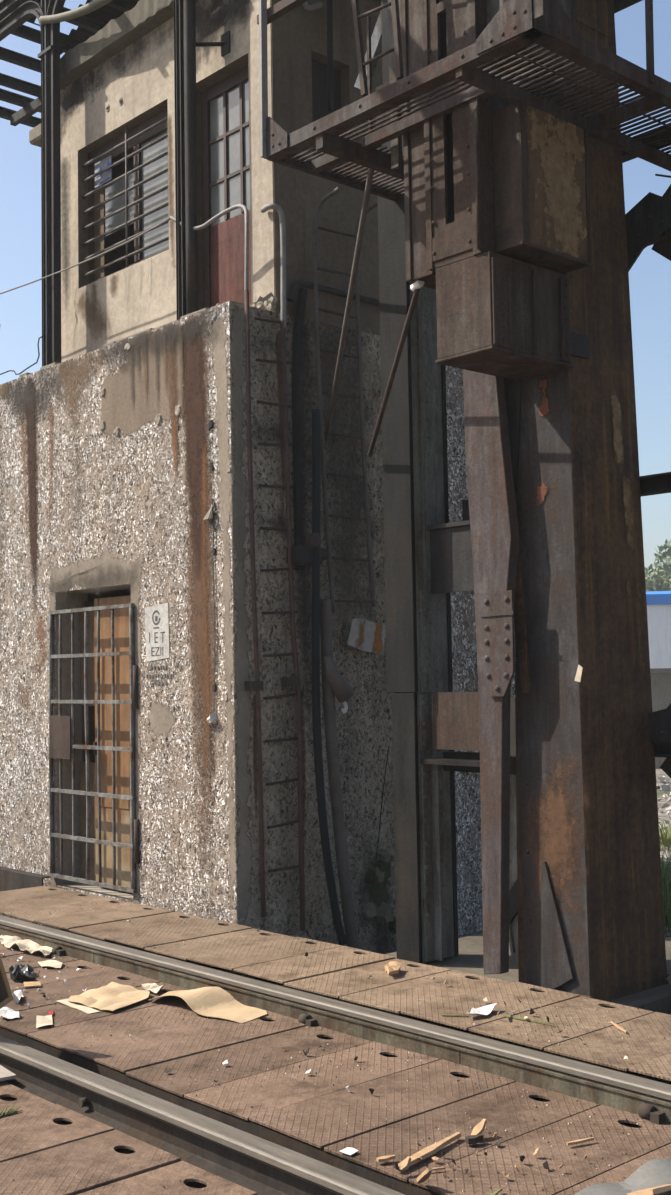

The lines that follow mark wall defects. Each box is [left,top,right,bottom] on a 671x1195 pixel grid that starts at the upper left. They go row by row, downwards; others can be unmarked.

damp [78,284,106,334]
damp [59,353,102,413]
corrosion [21,379,53,593]
corrosion [535,481,549,505]
corrosion [167,318,215,836]
corrosion [527,765,577,907]